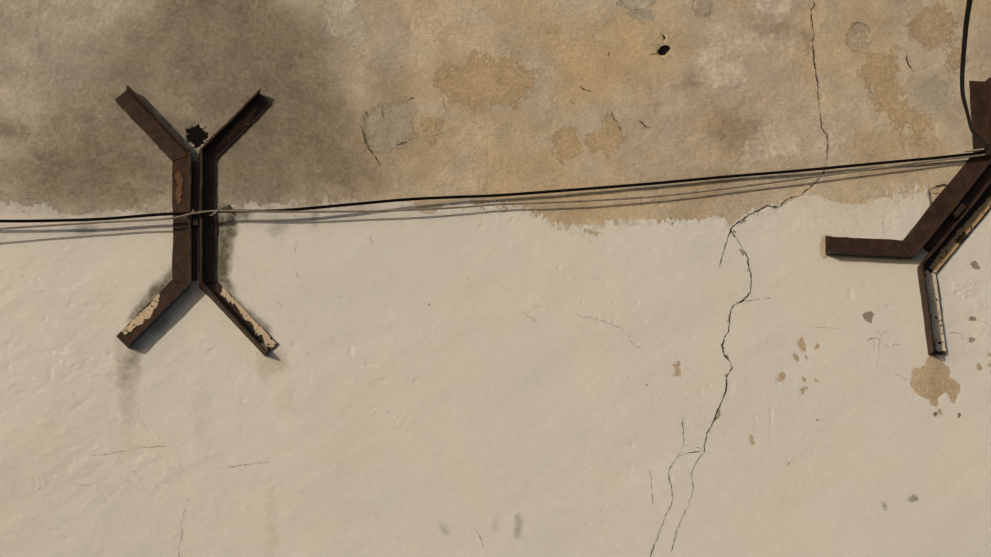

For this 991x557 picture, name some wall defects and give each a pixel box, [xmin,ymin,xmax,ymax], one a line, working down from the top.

leakage [323,0,400,69]
peeling [908,3,968,73]
flaking render [186,124,210,148]
flaking render [363,96,417,154]
peeling [552,114,623,164]
peeling [857,49,932,146]
peeling [928,184,947,203]
peeling [819,234,832,259]
crack [650,0,829,557]
peeling [911,196,991,418]
peeling [794,337,820,361]